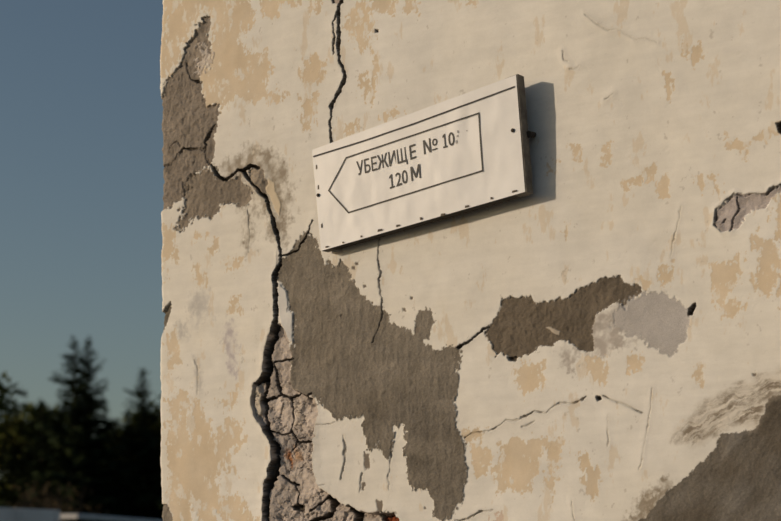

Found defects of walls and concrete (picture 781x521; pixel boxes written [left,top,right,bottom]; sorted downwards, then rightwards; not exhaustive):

crack [330,1,347,140]
peeling [342,0,421,122]
spalling [160,0,328,284]
crack [164,125,365,521]
spalling [161,283,396,521]
crack [371,238,384,343]
crack [386,441,394,491]
peeling [462,425,565,504]
peeling [513,358,547,402]
crack [465,388,653,469]
flaking render [609,259,694,375]
peeling [693,173,781,320]